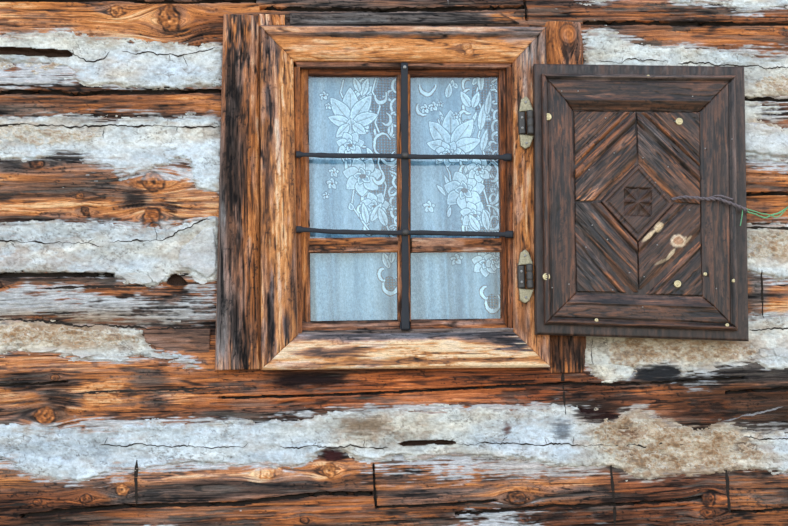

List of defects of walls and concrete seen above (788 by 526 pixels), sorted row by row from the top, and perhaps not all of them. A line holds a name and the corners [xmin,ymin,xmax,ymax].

crack [0,0,524,13]
crack [72,47,219,66]
crack [0,87,221,96]
peeling [118,270,208,286]